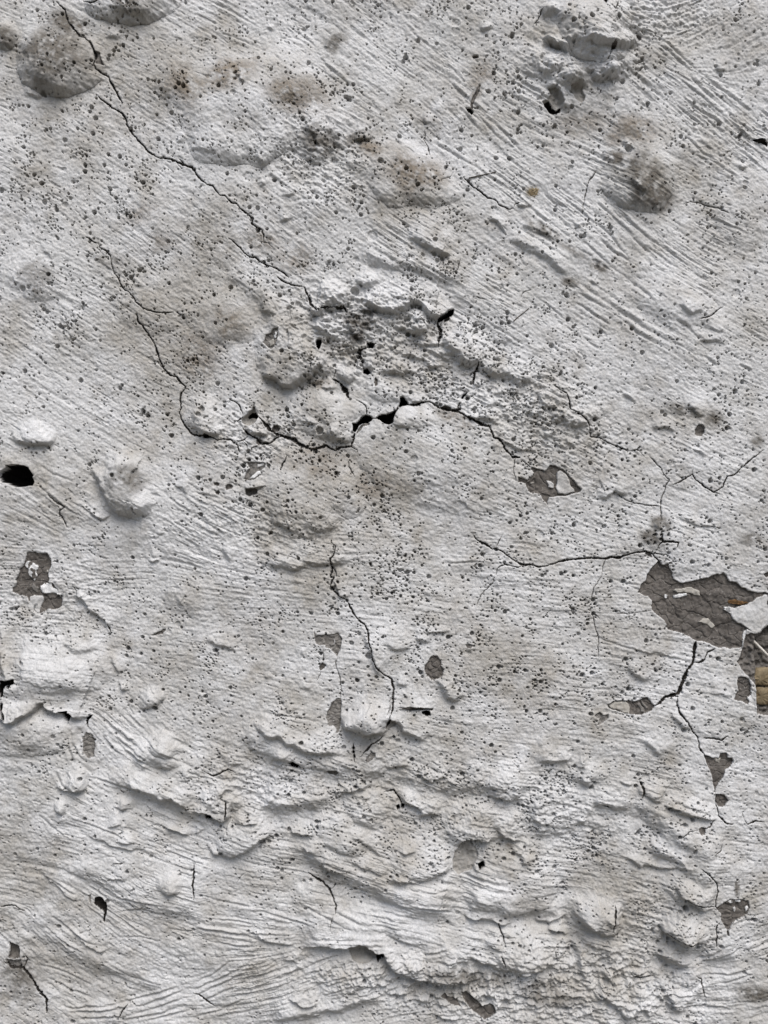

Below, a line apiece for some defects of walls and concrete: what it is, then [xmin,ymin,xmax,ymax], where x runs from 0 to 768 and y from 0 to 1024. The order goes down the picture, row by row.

crack [57,0,347,313]
crack [441,176,520,210]
crack [86,237,530,478]
spalling [518,465,581,503]
crack [474,384,763,653]
spalling [13,552,63,613]
spalling [638,562,768,649]
crack [329,546,395,762]
spalling [425,656,444,680]
crack [655,641,728,754]
spalling [704,753,733,807]
spalling [716,899,750,936]